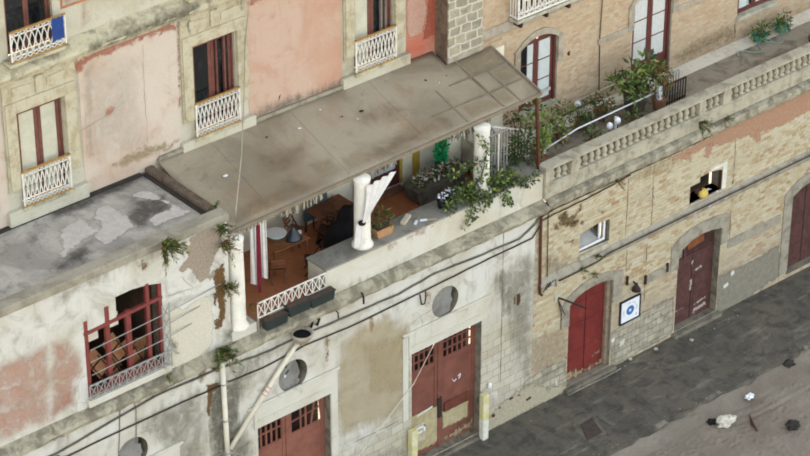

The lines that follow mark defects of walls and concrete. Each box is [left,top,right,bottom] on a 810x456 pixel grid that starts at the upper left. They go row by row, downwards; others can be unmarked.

peeling [423,0,435,40]
flaking render [669,91,810,162]
damp [53,173,191,268]
spalling [179,227,226,329]
peeling [412,401,473,450]